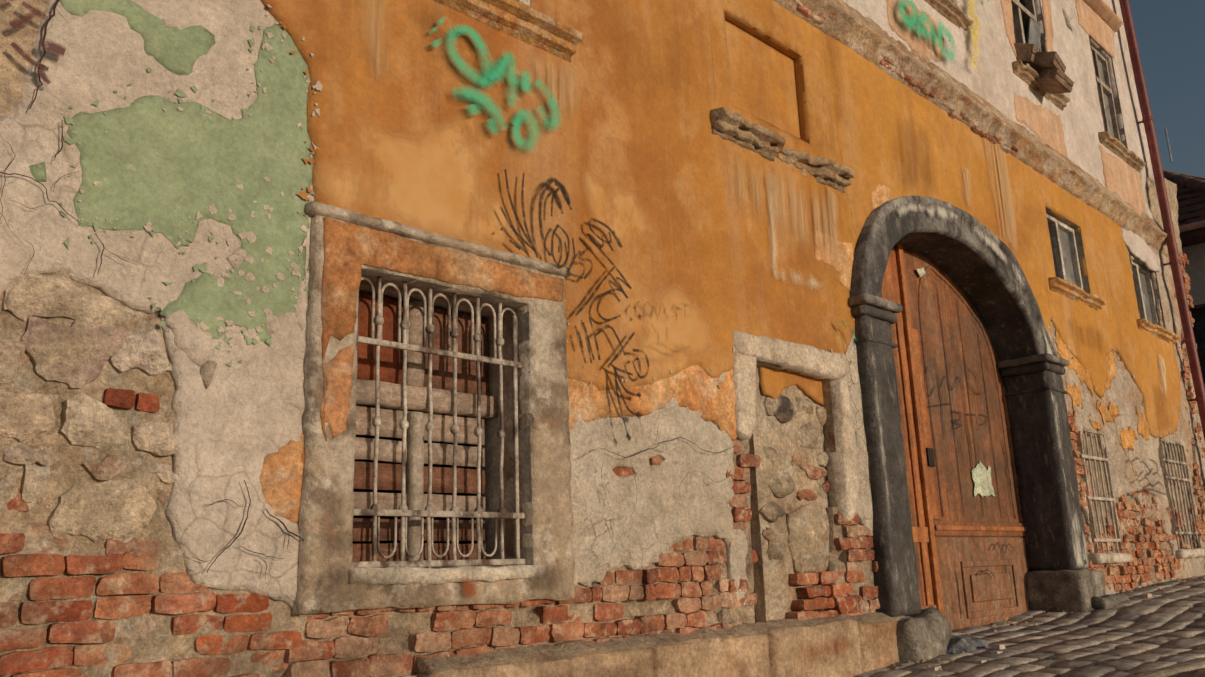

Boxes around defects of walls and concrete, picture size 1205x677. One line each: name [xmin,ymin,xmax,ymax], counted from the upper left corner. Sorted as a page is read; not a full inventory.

crack [29,0,66,109]
crack [0,119,137,274]
crack [193,480,304,578]
peeling [0,0,769,677]
flaking render [825,319,880,614]
peeling [1048,178,1205,595]